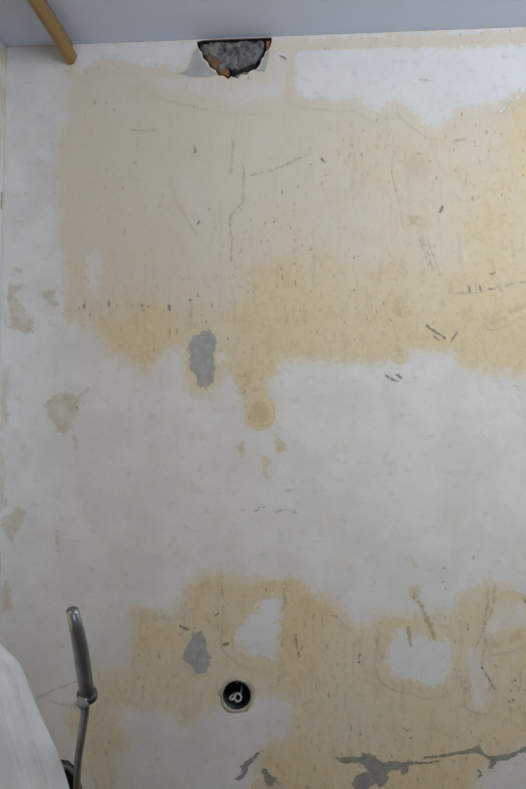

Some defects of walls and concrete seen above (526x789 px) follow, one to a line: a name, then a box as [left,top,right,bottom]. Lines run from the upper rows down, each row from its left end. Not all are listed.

spalling [175,38,286,79]
peeling [0,46,314,789]
peeling [207,335,526,646]
damp [251,769,292,789]
peeling [416,723,526,789]